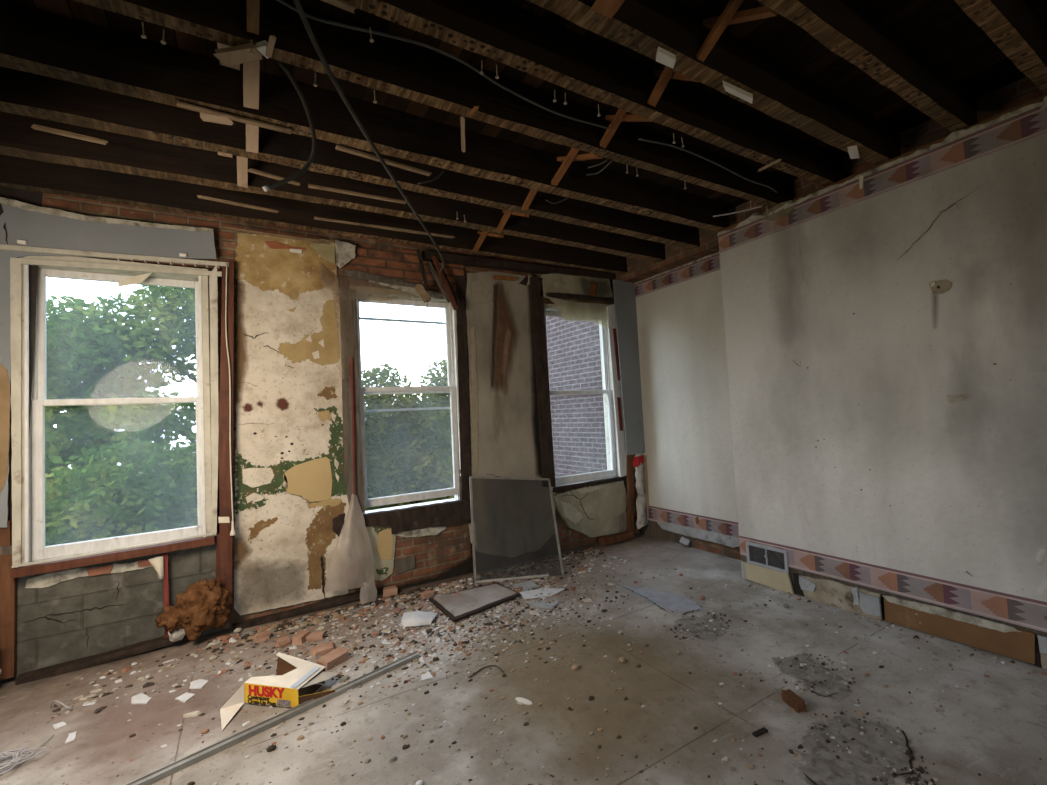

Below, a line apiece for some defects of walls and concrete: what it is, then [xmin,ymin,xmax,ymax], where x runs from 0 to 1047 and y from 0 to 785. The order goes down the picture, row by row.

spalling [0,186,42,207]
crack [898,185,982,260]
spalling [29,265,38,432]
peeling [234,232,340,366]
peeling [0,364,12,520]
peeling [233,386,347,590]
flaking render [375,522,471,599]
spalling [882,595,1021,633]